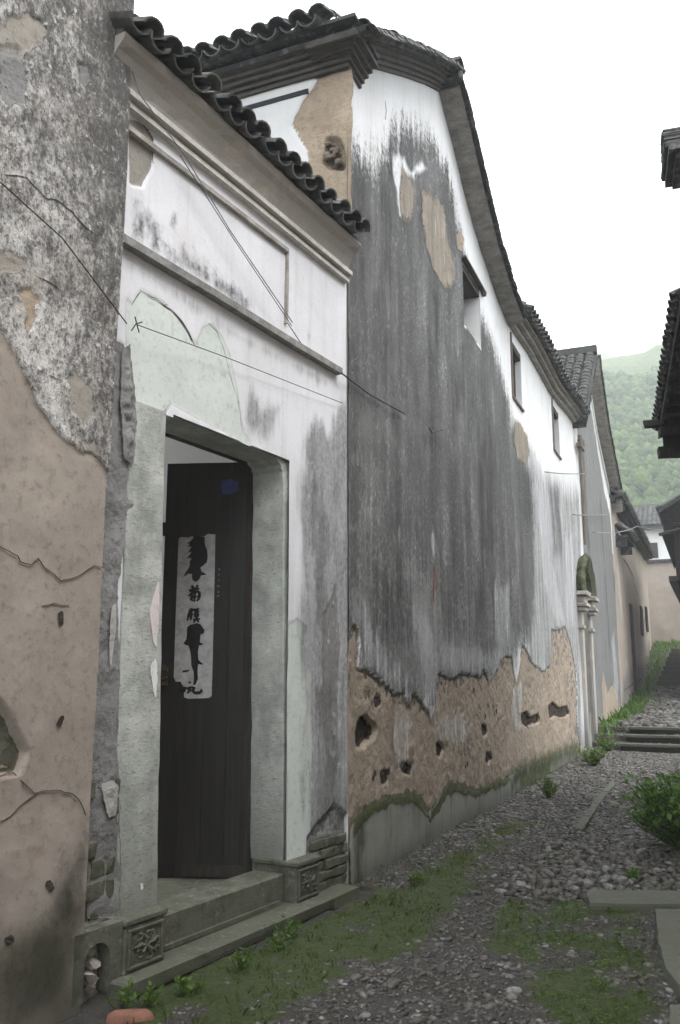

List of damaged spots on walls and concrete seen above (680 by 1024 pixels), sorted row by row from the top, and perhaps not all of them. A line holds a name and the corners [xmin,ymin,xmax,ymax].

peeling [129,119,154,187]
damp [183,255,247,306]
flaking render [292,68,354,209]
flaking render [393,153,464,290]
damp [301,109,650,852]
flaking render [514,422,530,465]
crack [0,546,102,605]
flaking render [0,289,251,1024]
crack [0,772,86,821]
flaking render [286,584,579,892]